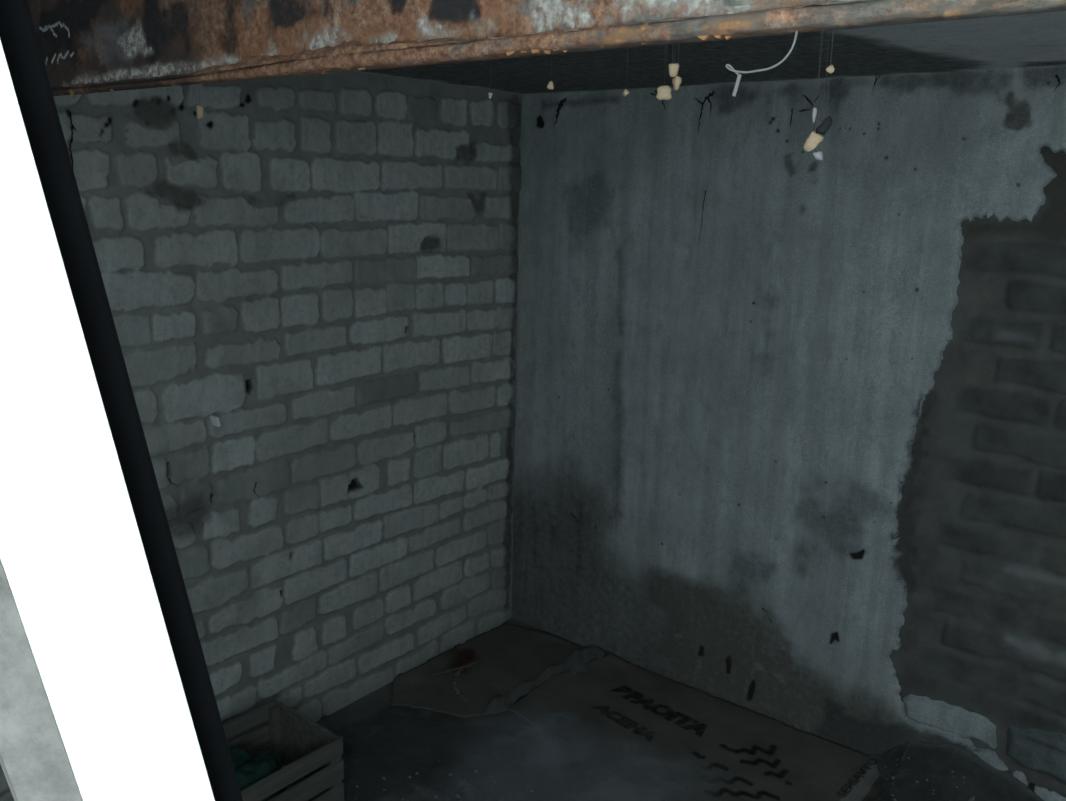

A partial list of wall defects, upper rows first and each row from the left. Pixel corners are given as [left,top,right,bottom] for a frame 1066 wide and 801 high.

rust [698,21,750,40]
crack [68,111,77,168]
crack [554,98,566,126]
crack [694,91,715,131]
crack [790,95,819,127]
leakage [508,100,521,383]
spalling [887,146,1066,798]
leakage [503,399,976,756]